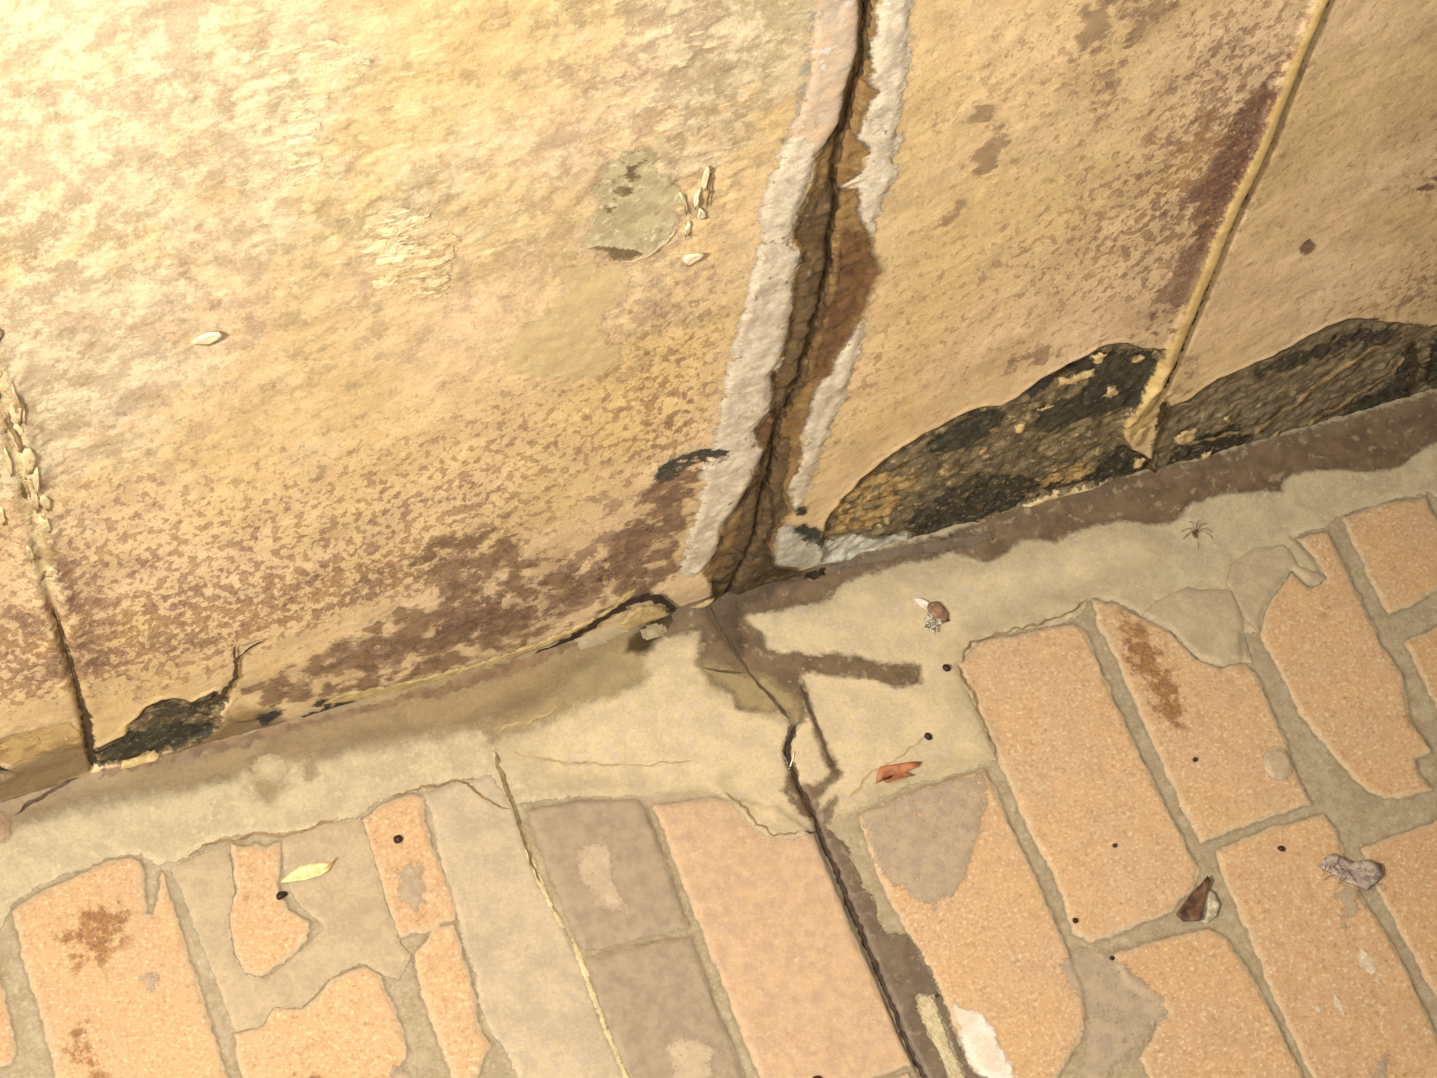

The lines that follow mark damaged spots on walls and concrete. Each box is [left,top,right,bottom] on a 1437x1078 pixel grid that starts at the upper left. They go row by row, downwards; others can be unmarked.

crack [5,412,28,501]
crack [536,0,927,1078]
leakage [607,0,1437,1078]
flaking render [793,312,1437,546]
crack [1154,271,1215,432]
crack [53,608,97,766]
flaking render [93,692,229,769]
leakage [0,529,657,842]